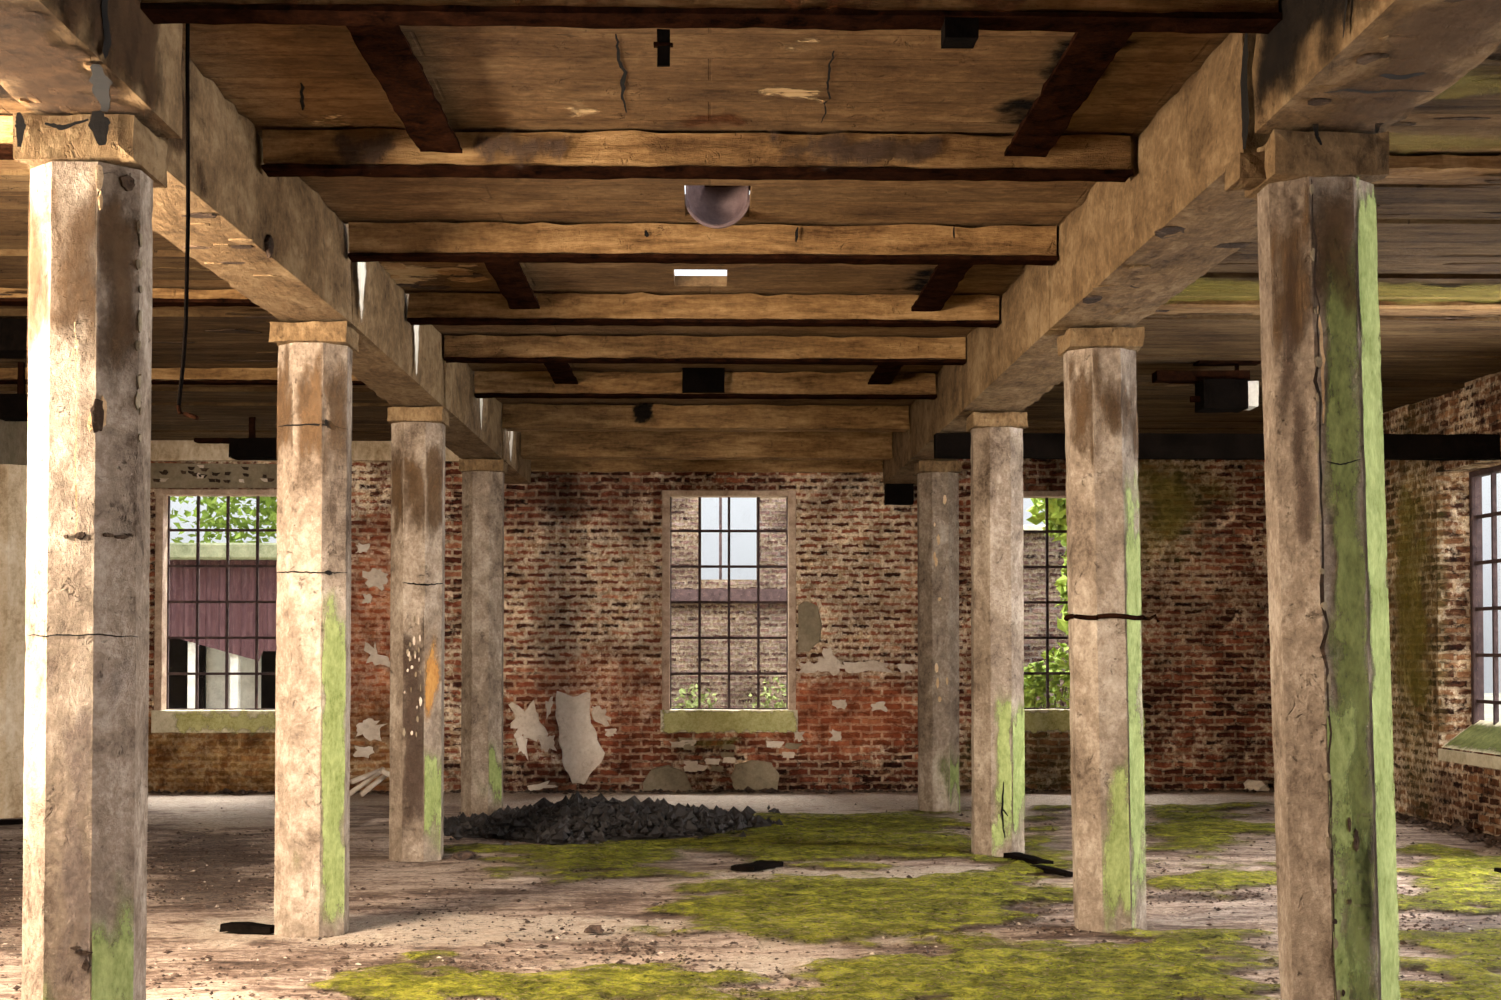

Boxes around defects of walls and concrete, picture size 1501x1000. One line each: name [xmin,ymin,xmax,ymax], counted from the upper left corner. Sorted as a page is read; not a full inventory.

crack [615,34,627,113]
crack [821,51,834,123]
water stain [1169,177,1501,1000]
peeling [798,602,913,676]
water stain [321,594,346,921]
rust [425,643,439,716]
peeling [508,691,617,791]
peeling [669,732,805,791]
peeling [828,729,842,741]
peeling [832,699,847,710]
peeling [871,701,888,712]
water stain [1013,704,1025,832]